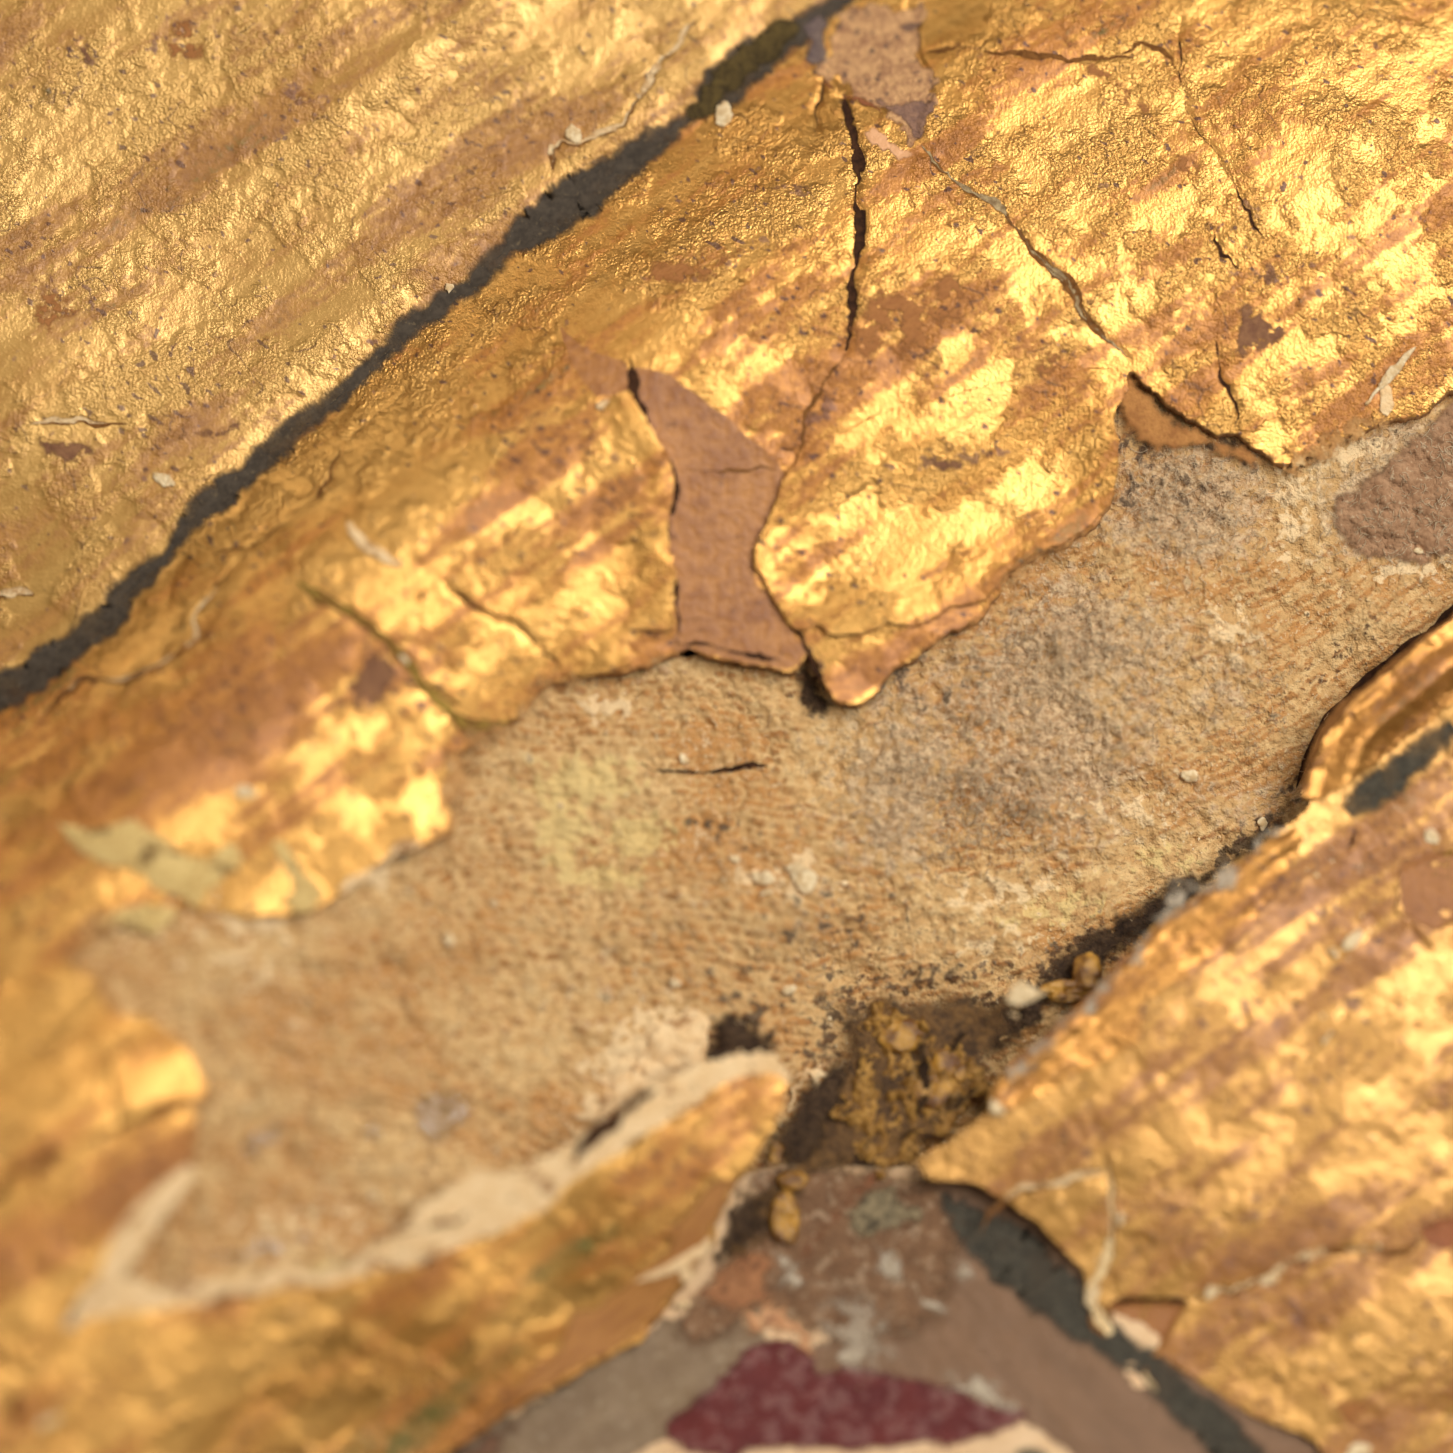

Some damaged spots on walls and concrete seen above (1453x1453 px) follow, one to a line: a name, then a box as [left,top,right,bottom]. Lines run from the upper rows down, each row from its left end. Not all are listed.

crack [548,20,696,170]
crack [794,78,866,464]
crack [922,146,1128,358]
crack [1,416,127,441]
crack [0,587,34,598]
crack [42,391,405,717]
crack [298,581,509,738]
crack [641,761,768,775]
peeling [58,327,1453,1356]
damp [1208,866,1237,892]
crack [979,1156,1117,1337]
crack [1196,1238,1420,1301]